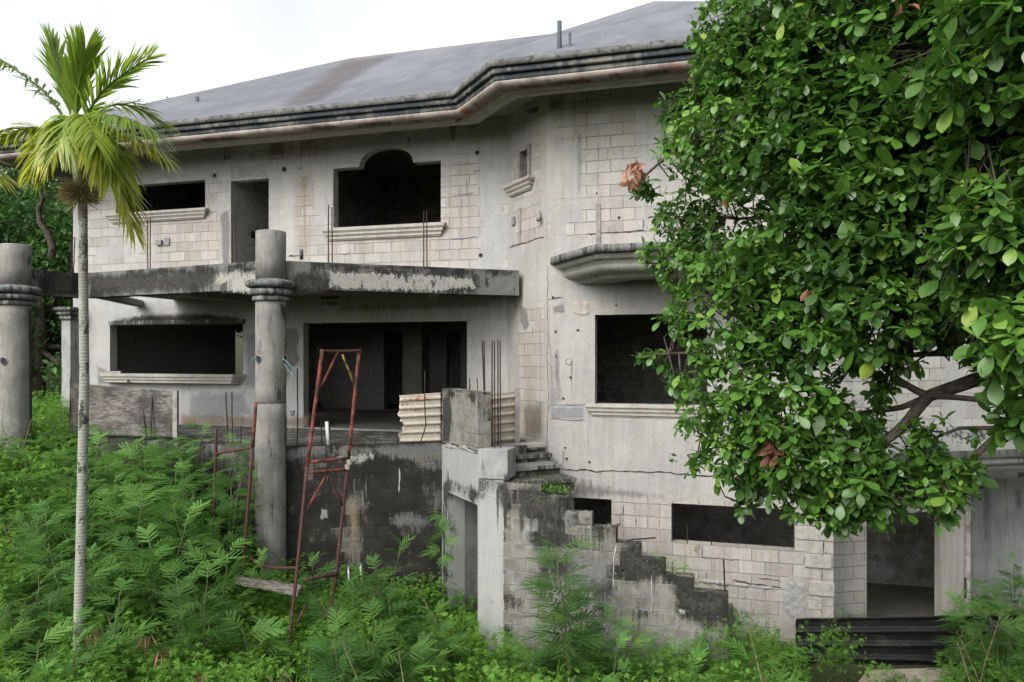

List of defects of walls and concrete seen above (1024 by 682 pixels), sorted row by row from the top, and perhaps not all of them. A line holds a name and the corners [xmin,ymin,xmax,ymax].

corrosion [520,77,589,88]
peeling [328,205,476,293]
crack [547,275,562,320]
crack [547,346,722,478]
damp [340,451,374,464]
efflorescence [397,515,427,530]
damp [496,482,563,534]
damp [569,557,607,586]
damp [622,547,660,585]